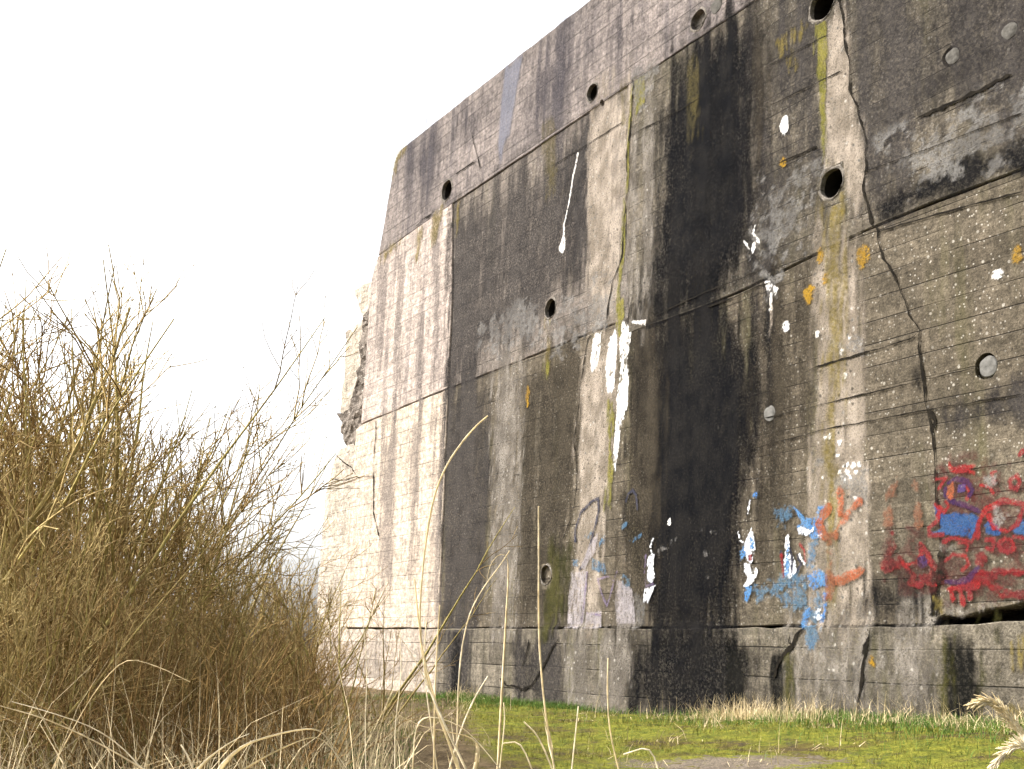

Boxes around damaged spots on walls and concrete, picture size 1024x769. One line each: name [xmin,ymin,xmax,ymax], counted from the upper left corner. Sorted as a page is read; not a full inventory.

leakage [377,246,404,402]
leakage [406,0,1024,720]
crack [837,0,941,549]
leakage [380,411,396,586]
crack [773,626,806,679]
crack [857,628,871,711]